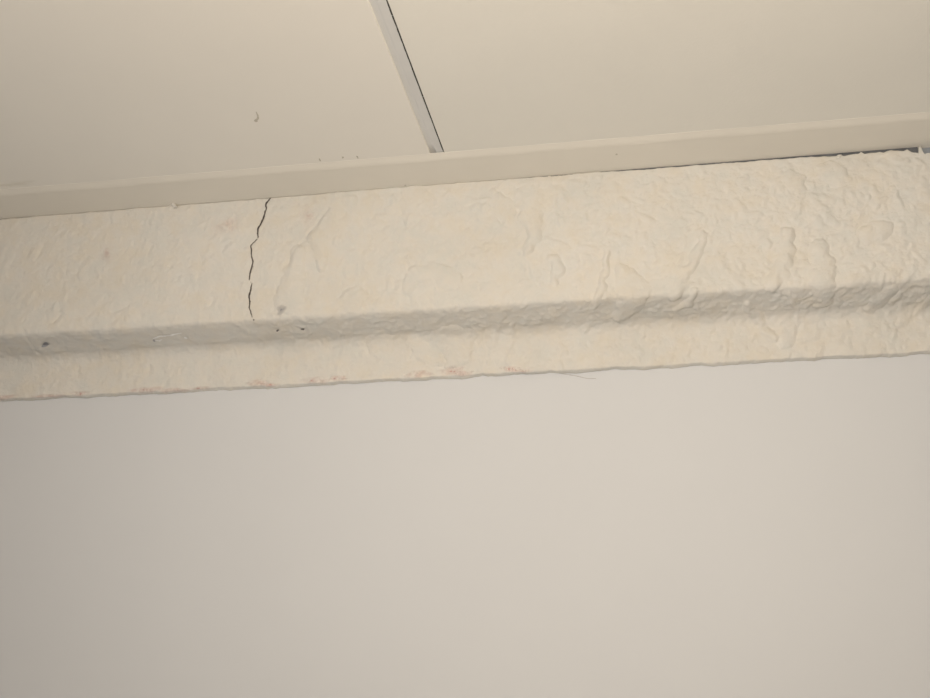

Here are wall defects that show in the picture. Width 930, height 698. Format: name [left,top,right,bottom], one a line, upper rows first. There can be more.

crack [248,198,271,321]